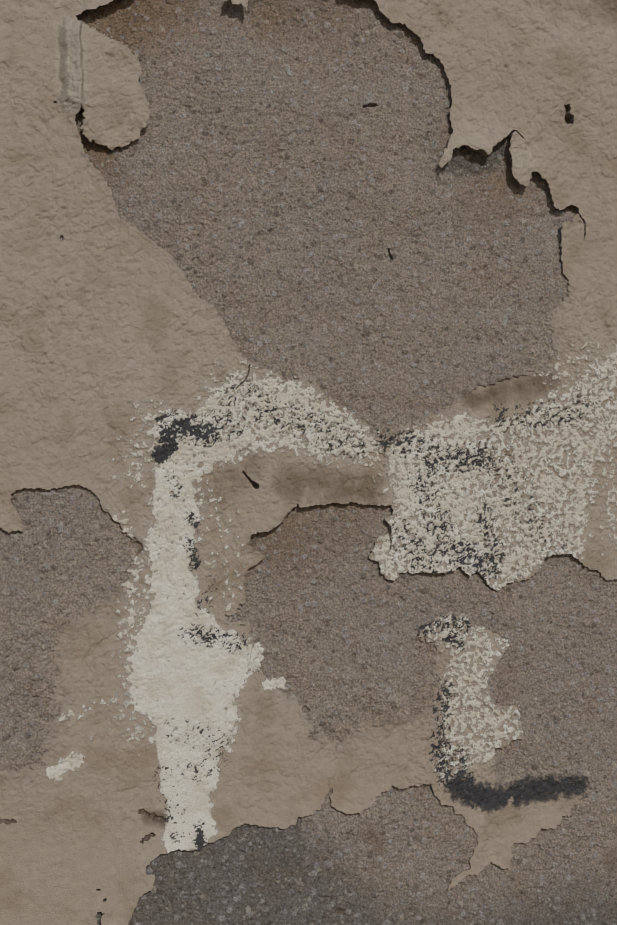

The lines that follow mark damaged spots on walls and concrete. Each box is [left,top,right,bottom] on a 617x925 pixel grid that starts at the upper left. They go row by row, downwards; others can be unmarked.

peeling [70,0,579,436]
peeling [0,484,144,773]
peeling [95,502,617,925]